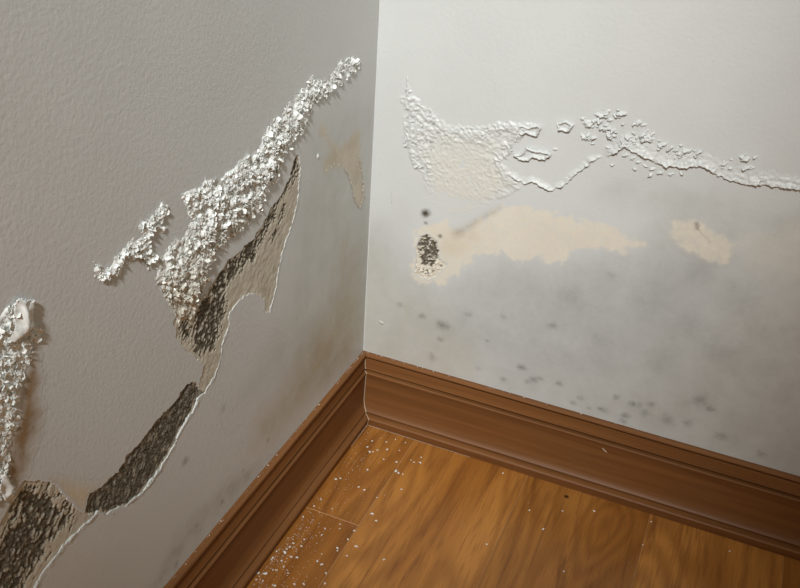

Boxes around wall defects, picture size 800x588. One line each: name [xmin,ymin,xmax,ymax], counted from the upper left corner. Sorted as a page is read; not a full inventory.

peeling [0,56,361,588]
spalling [414,234,447,279]
damp [144,64,800,588]